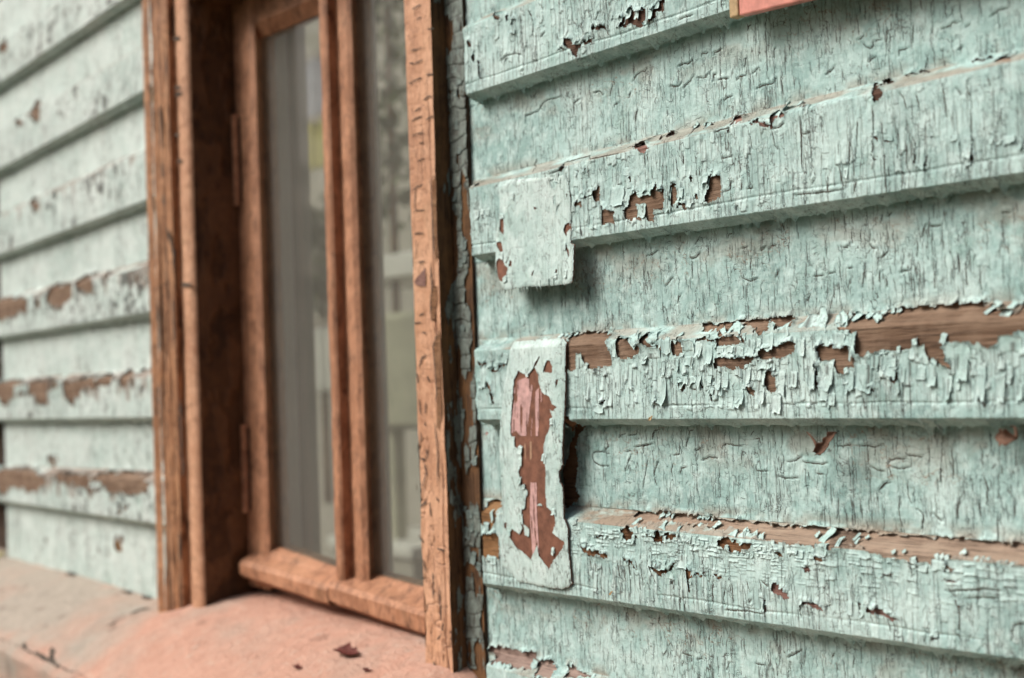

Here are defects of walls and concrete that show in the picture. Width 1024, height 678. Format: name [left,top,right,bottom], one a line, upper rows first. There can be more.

crack [858,25,914,62]
crack [504,48,645,119]
crack [673,48,776,100]
crack [899,76,990,130]
crack [533,109,941,310]
peeling [0,268,117,323]
peeling [414,0,1024,678]
peeling [0,366,151,407]
peeling [0,454,153,514]
crack [591,429,960,526]
crack [703,580,768,614]
crack [948,588,1009,628]